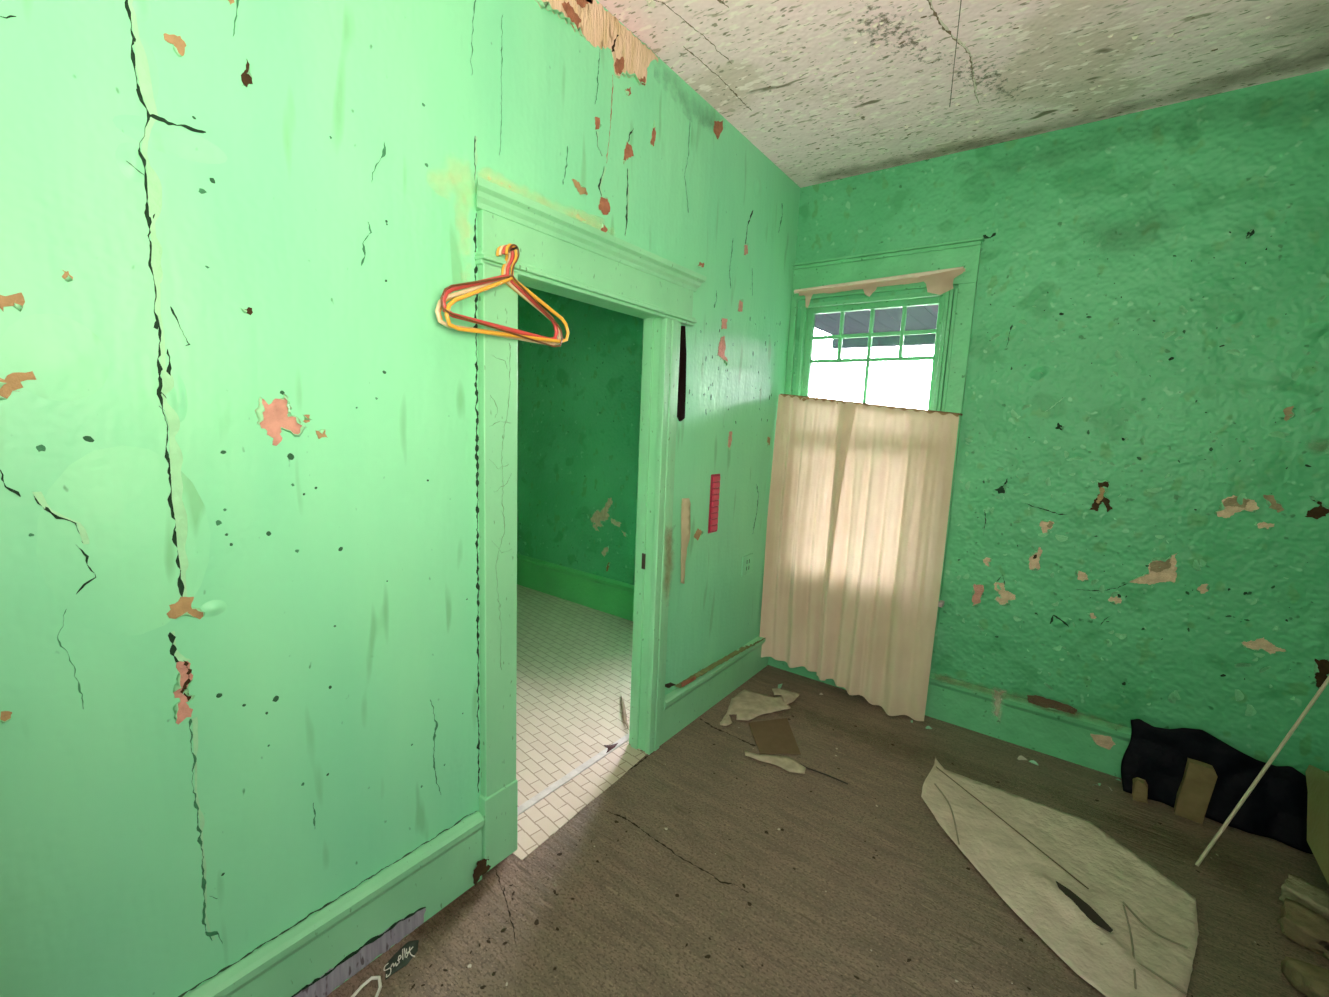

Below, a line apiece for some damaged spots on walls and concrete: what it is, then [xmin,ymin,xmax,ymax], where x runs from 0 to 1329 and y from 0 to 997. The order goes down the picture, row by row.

spalling [535,0,660,96]
peeling [0,293,25,312]
crack [125,0,206,597]
peeling [0,371,37,400]
peeling [255,391,328,460]
spalling [1082,480,1116,520]
crack [0,470,96,709]
spalling [167,597,205,619]
peeling [950,551,1038,628]
peeling [1087,535,1210,661]
crack [168,631,191,662]
spalling [1308,659,1329,688]